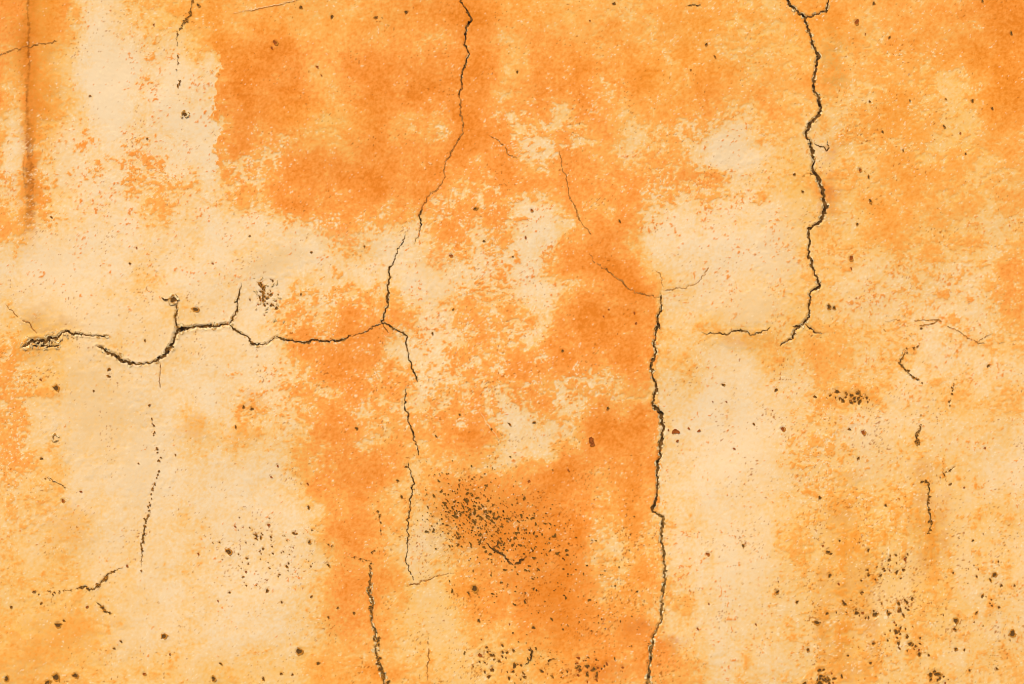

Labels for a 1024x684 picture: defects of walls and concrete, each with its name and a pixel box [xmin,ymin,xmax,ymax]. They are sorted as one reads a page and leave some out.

crack [5,0,472,615]
crack [559,152,708,684]
crack [704,0,830,346]
crack [326,510,391,684]
rust [546,608,699,684]